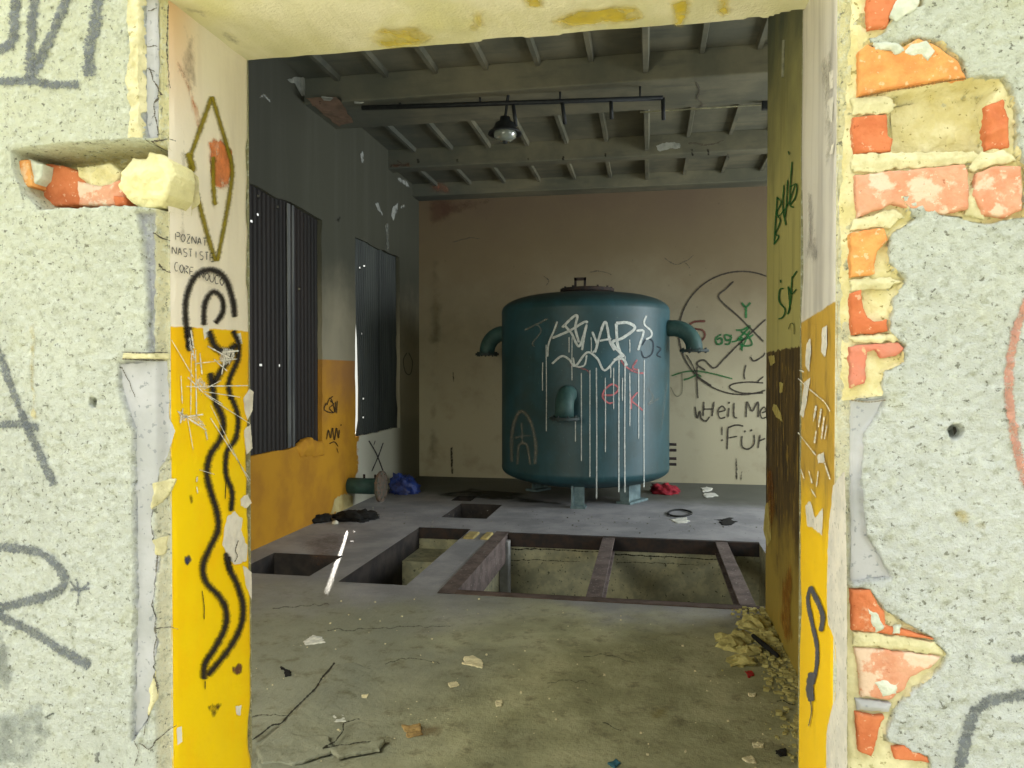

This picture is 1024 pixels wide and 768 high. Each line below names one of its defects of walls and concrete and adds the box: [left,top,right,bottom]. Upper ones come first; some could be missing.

flaking render [805,0,1024,768]
flaking render [120,361,177,735]
peeling [222,494,252,600]
peeling [331,494,353,514]
crack [252,663,335,740]